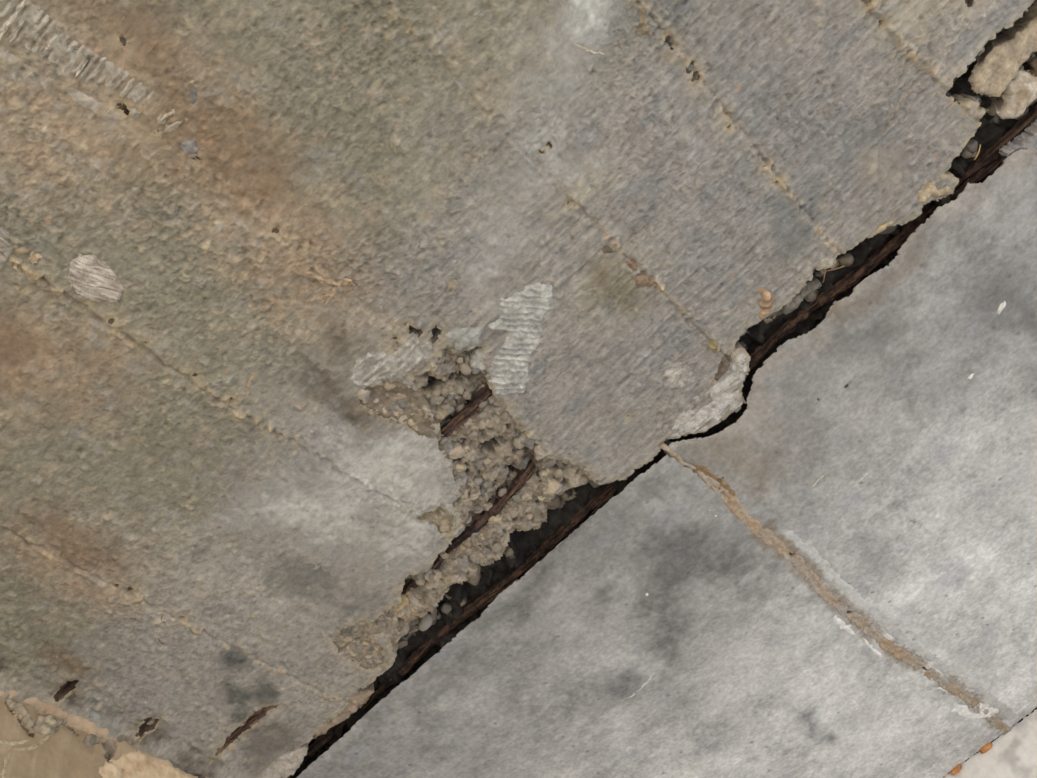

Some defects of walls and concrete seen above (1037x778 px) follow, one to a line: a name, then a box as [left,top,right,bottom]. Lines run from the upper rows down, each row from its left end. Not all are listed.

crack [948,29,1037,185]
spalling [747,77,1037,373]
spalling [259,323,628,778]
crack [283,203,928,778]
hole [51,680,79,702]
flaking render [99,718,199,778]
spalling [209,705,278,758]